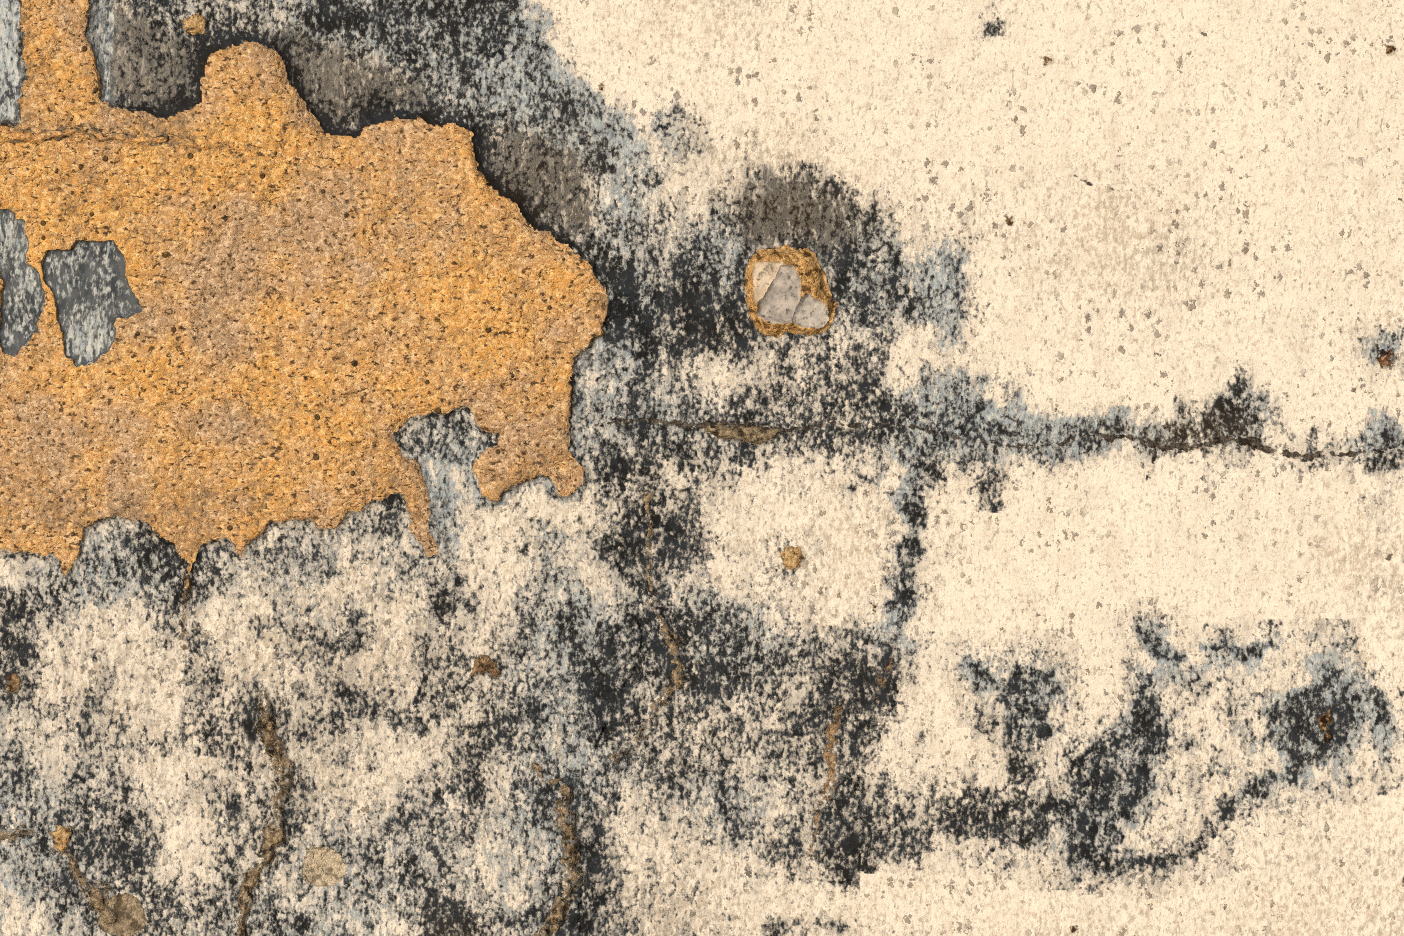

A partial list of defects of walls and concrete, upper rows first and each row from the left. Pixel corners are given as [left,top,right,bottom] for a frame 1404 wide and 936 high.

leakage [0,0,28,126]
flaking render [0,0,608,588]
flaking render [743,244,839,338]
leakage [1354,311,1404,381]
crack [595,419,1404,480]
leakage [755,526,802,593]
crack [0,825,35,843]
crack [65,852,113,913]
crack [236,691,295,936]
crack [532,761,585,936]
leakage [761,894,871,936]